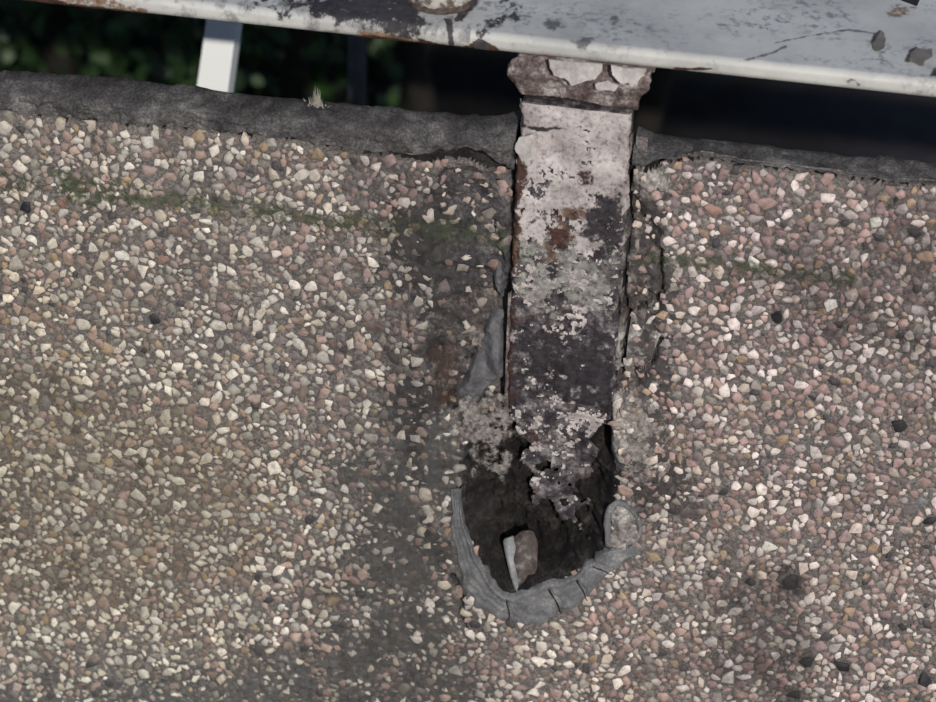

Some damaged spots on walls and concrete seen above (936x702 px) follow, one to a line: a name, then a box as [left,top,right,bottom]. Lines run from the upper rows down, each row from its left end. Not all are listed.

corrosion [411,0,468,13]
peeling [549,59,646,91]
corrosion [578,171,594,186]
corrosion [510,154,529,332]
corrosion [544,207,587,262]
crack [620,130,929,374]
spalling [423,98,666,593]
damp [616,401,664,485]
damp [0,322,615,702]